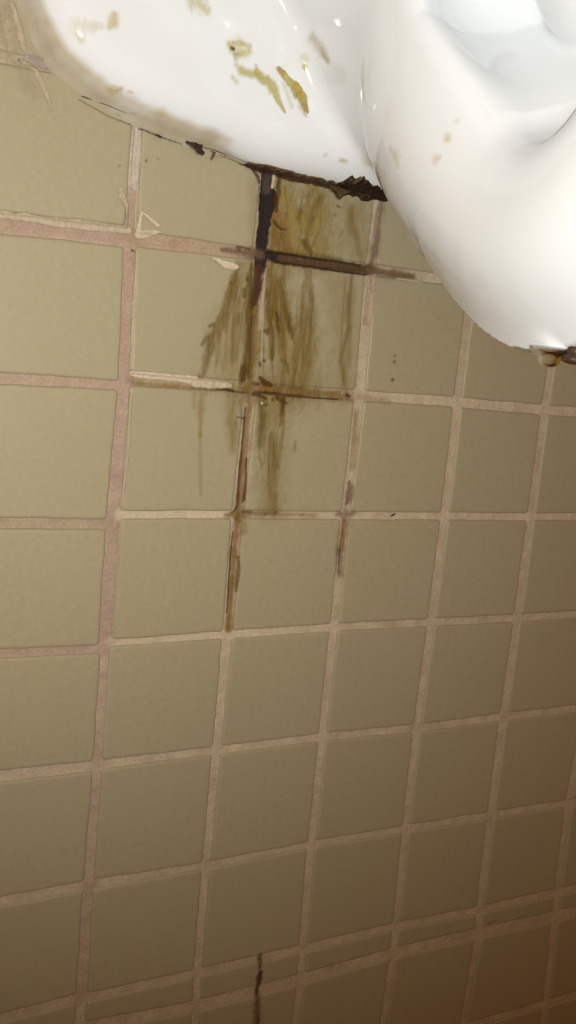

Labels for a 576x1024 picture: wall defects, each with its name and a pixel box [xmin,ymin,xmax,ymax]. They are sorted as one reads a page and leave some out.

peeling [0,210,233,389]
corrosion [269,179,328,259]
damp [222,173,414,392]
corrosion [137,263,350,631]